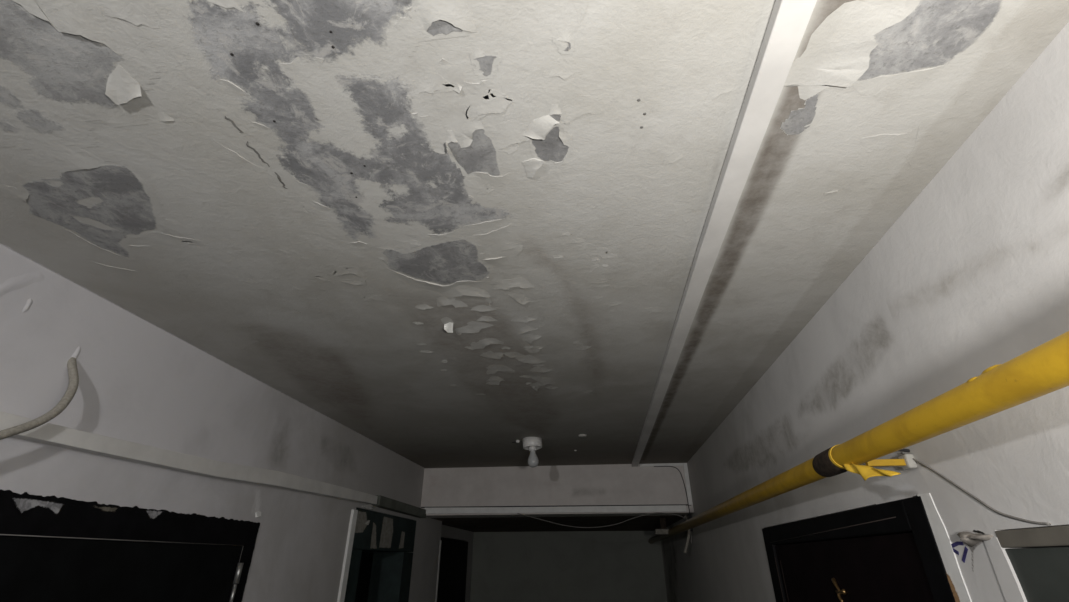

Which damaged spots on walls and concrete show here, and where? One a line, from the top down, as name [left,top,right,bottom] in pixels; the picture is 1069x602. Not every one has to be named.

peeling [780,0,1016,135]
peeling [0,0,199,275]
peeling [152,0,532,292]
peeling [521,104,572,178]
peeling [441,317,453,333]